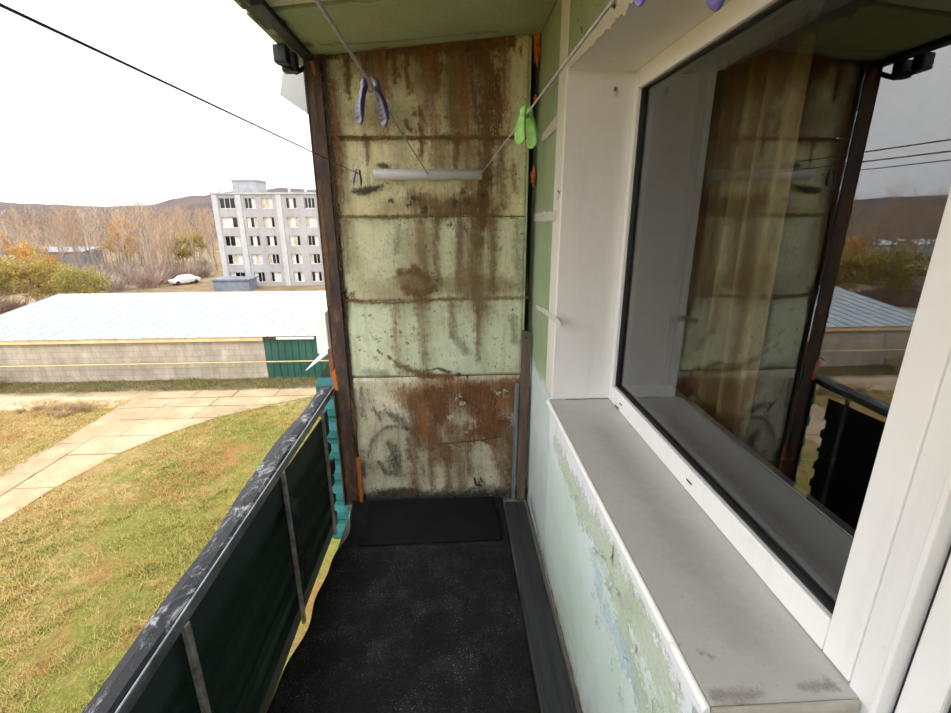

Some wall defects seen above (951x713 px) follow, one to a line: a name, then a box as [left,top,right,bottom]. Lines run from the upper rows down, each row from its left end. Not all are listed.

corrosion [305,33,541,494]
corrosion [355,456,364,502]
peeling [554,436,698,713]